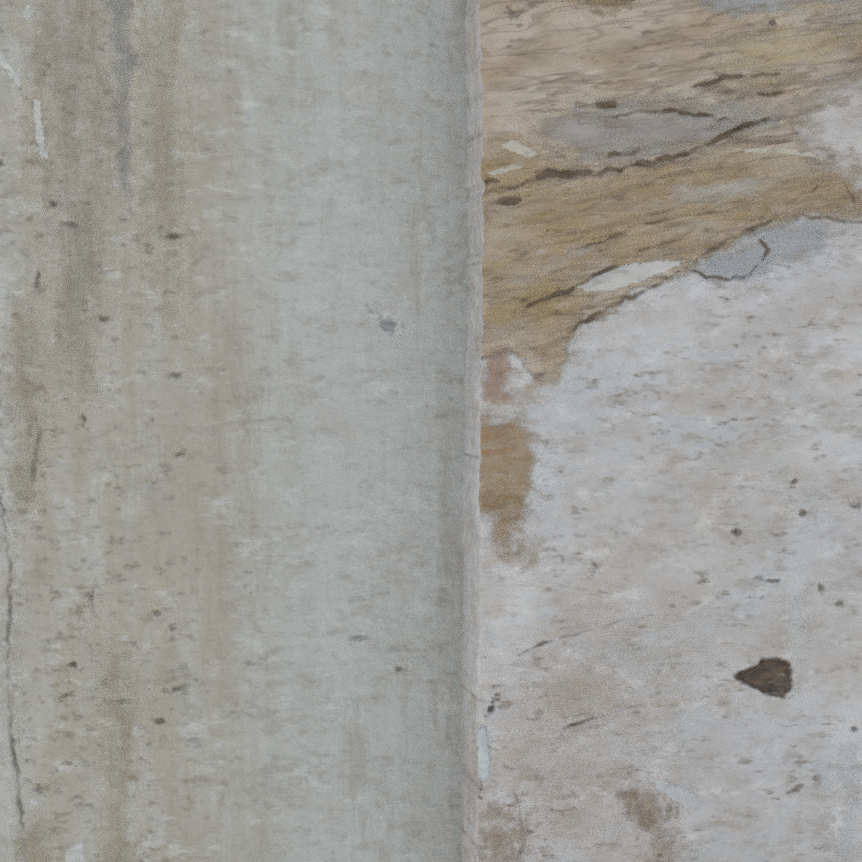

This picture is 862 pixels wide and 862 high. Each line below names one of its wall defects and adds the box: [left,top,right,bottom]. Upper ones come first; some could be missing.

crack [694,73,781,96]
crack [596,101,617,117]
crack [484,108,767,205]
peeling [479,0,862,381]
spalling [735,658,792,698]